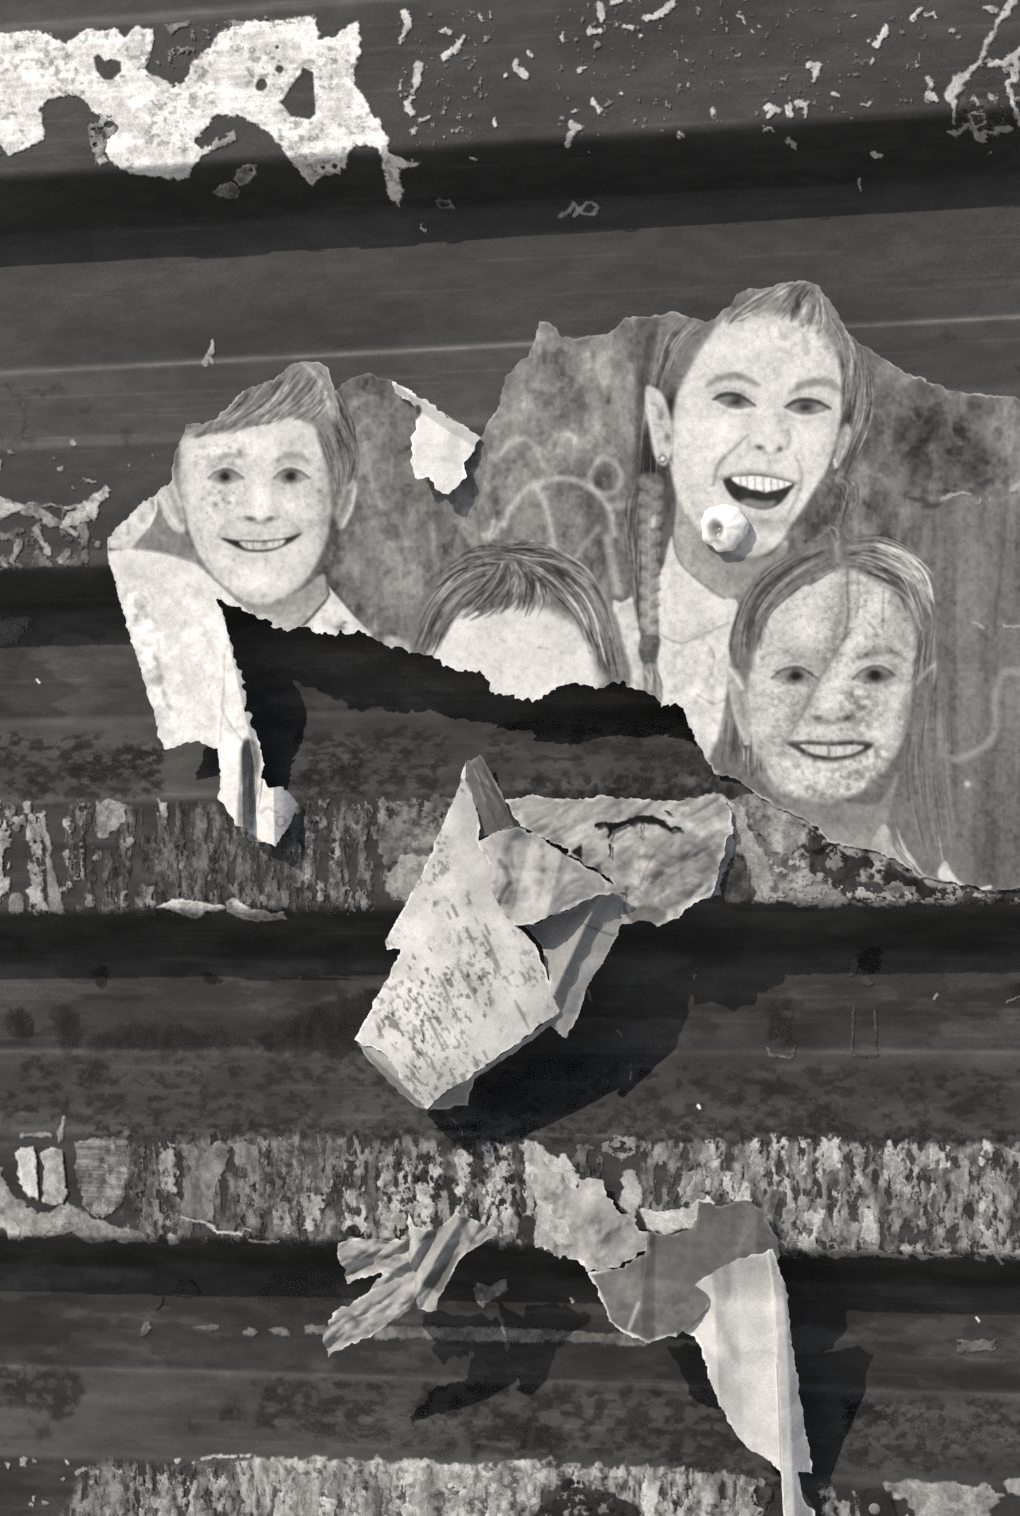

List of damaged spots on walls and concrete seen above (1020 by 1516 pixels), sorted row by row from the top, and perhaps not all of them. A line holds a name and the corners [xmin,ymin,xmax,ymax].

peeling [0,16,419,206]
peeling [398,9,497,145]
peeling [504,50,533,79]
peeling [738,0,1020,153]
peeling [95,798,126,839]
peeling [158,898,286,922]
peeling [15,1116,67,1205]
spalling [532,1478,638,1516]